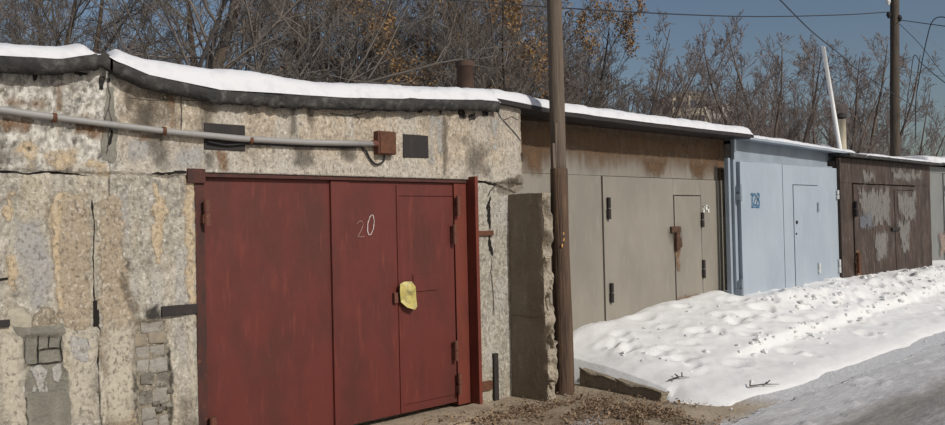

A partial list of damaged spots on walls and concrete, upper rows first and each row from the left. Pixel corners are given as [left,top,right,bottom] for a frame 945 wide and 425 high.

crack [0,84,200,176]
crack [478,180,543,318]
peeling [858,168,920,261]
crack [91,201,103,425]
water stain [0,334,29,425]
spalling [22,335,69,395]
spalling [129,305,174,425]